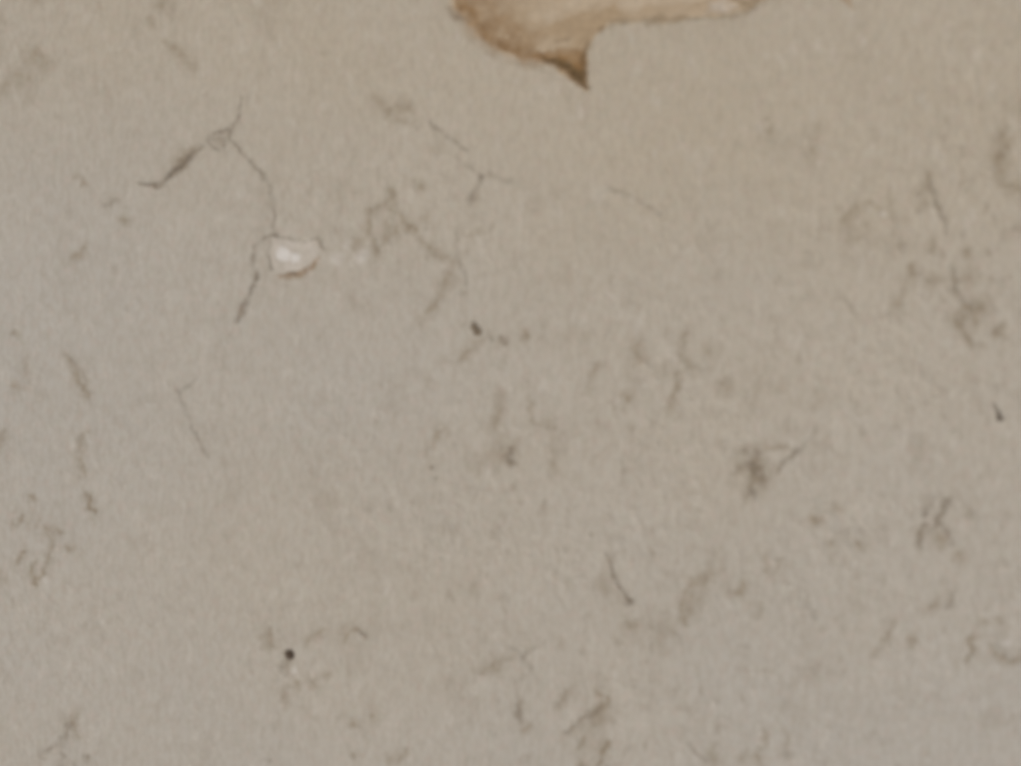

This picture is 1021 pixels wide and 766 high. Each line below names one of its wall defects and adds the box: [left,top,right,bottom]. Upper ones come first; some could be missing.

spalling [440,0,772,94]
crack [136,94,279,237]
spalling [232,231,372,326]